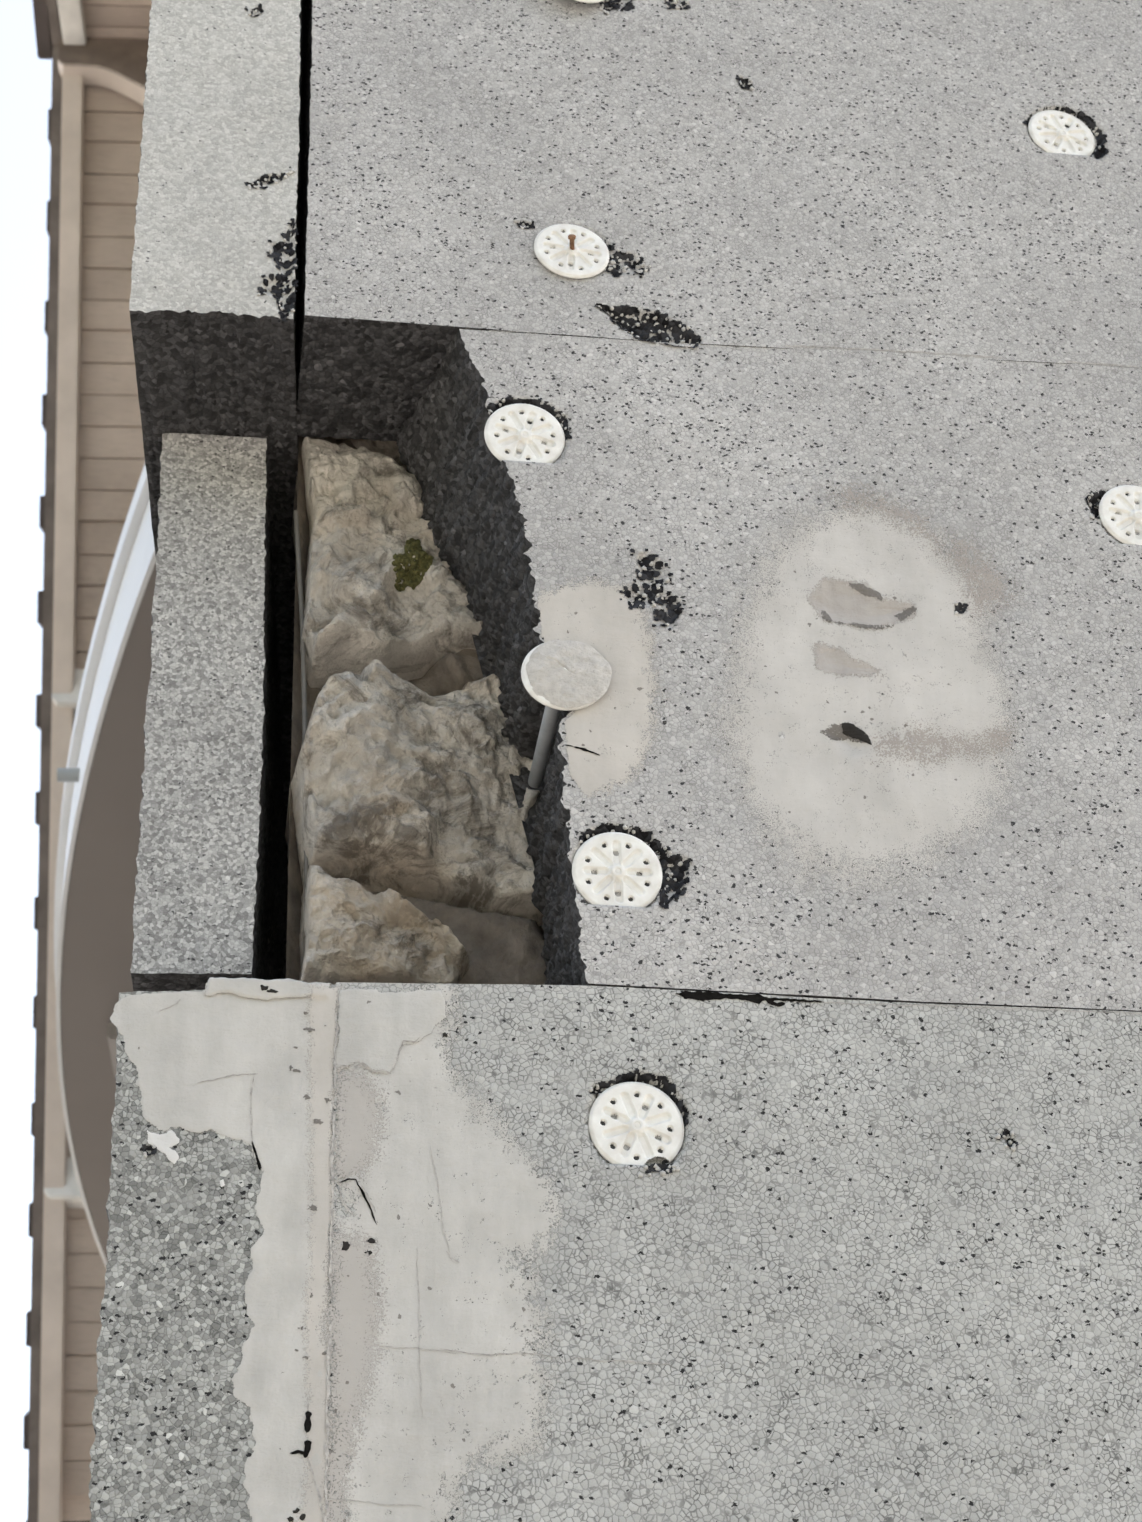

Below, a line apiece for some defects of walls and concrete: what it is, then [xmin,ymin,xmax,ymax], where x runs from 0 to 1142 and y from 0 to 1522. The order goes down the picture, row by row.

spalling [486,396,572,440]
spalling [142,1144,157,1158]
spalling [342,1238,375,1255]